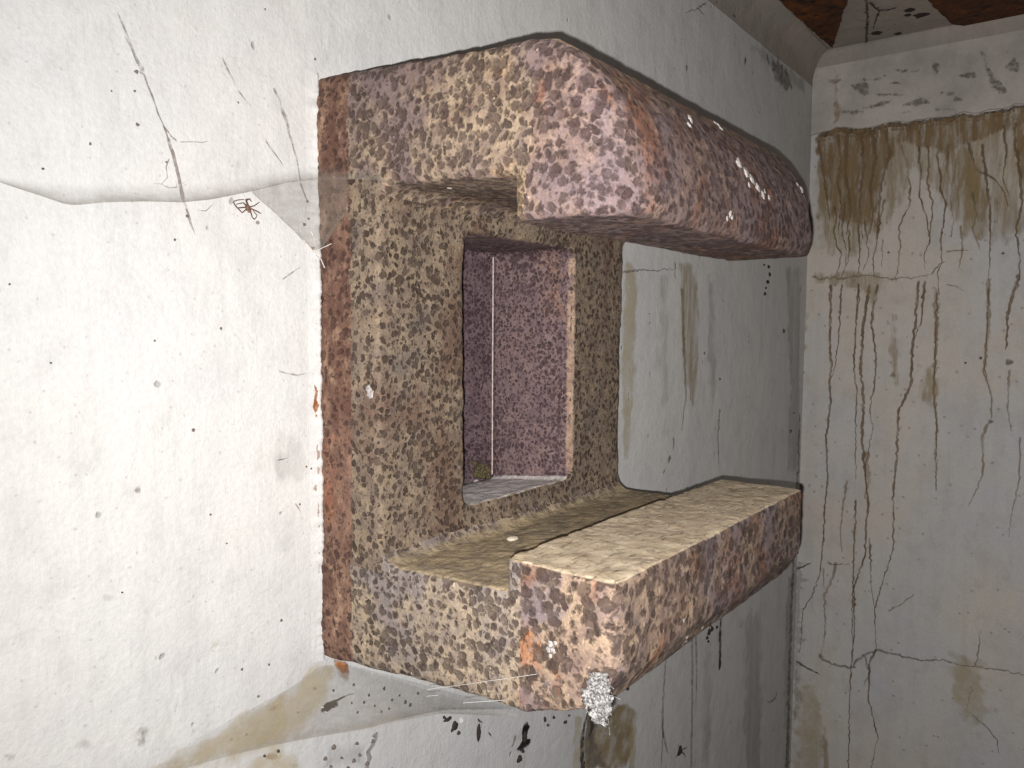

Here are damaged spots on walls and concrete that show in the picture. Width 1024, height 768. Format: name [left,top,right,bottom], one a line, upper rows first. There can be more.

damp [816,112,1024,303]
crack [785,560,1020,768]